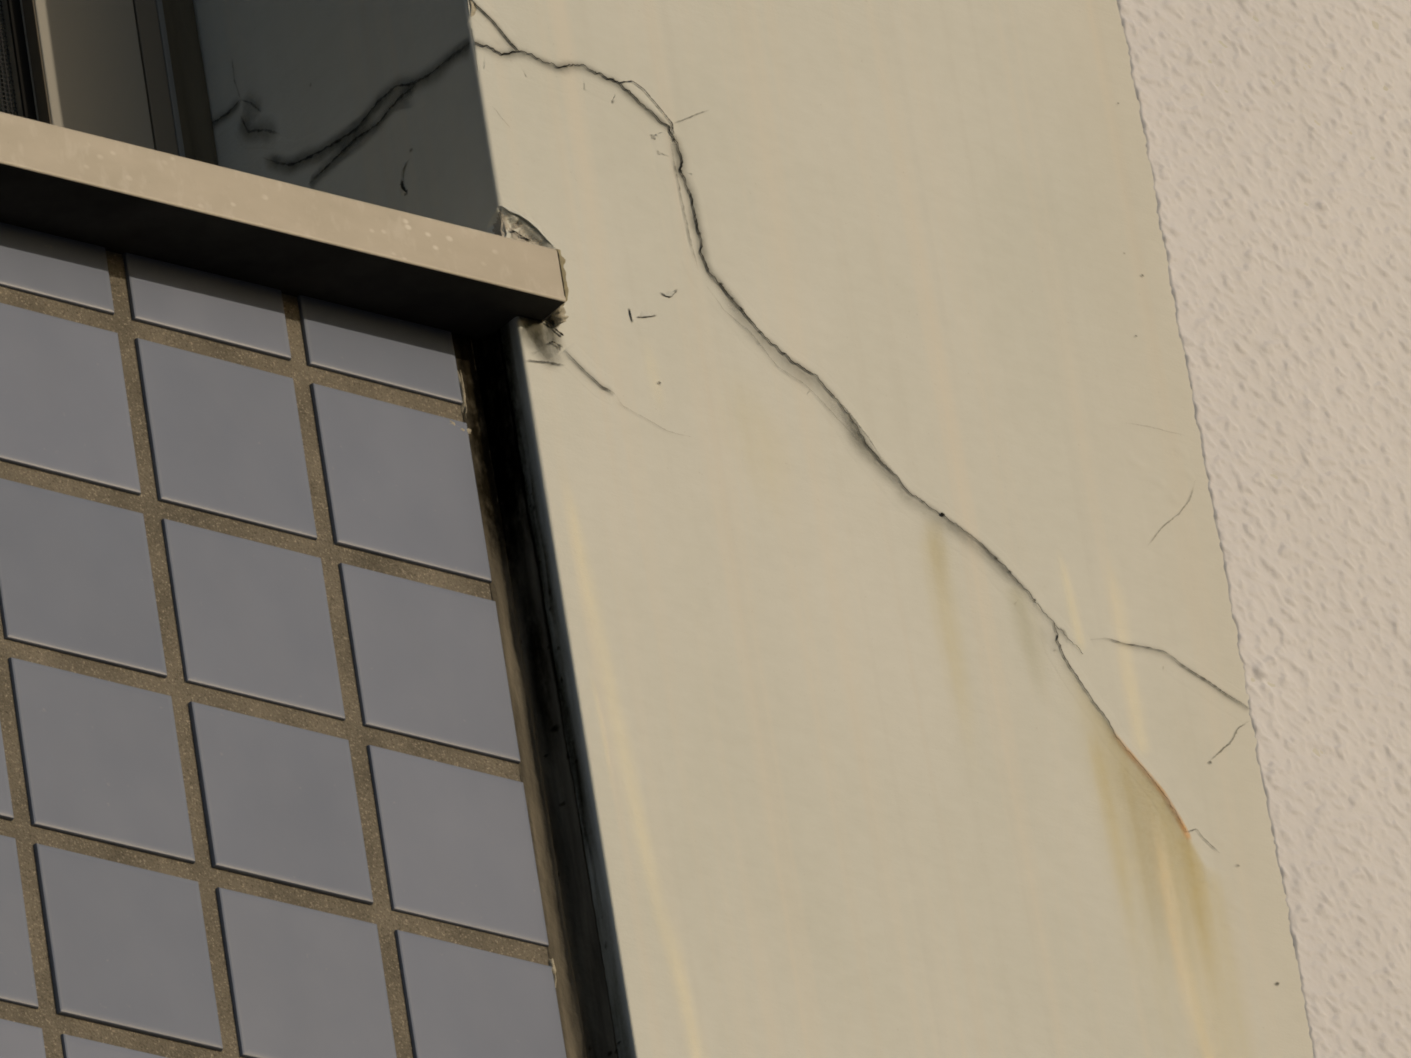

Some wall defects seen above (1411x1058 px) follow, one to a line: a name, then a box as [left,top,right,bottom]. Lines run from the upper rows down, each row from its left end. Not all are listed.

spalling [492,206,552,246]
damp [454,324,592,902]
crack [211,0,1249,848]